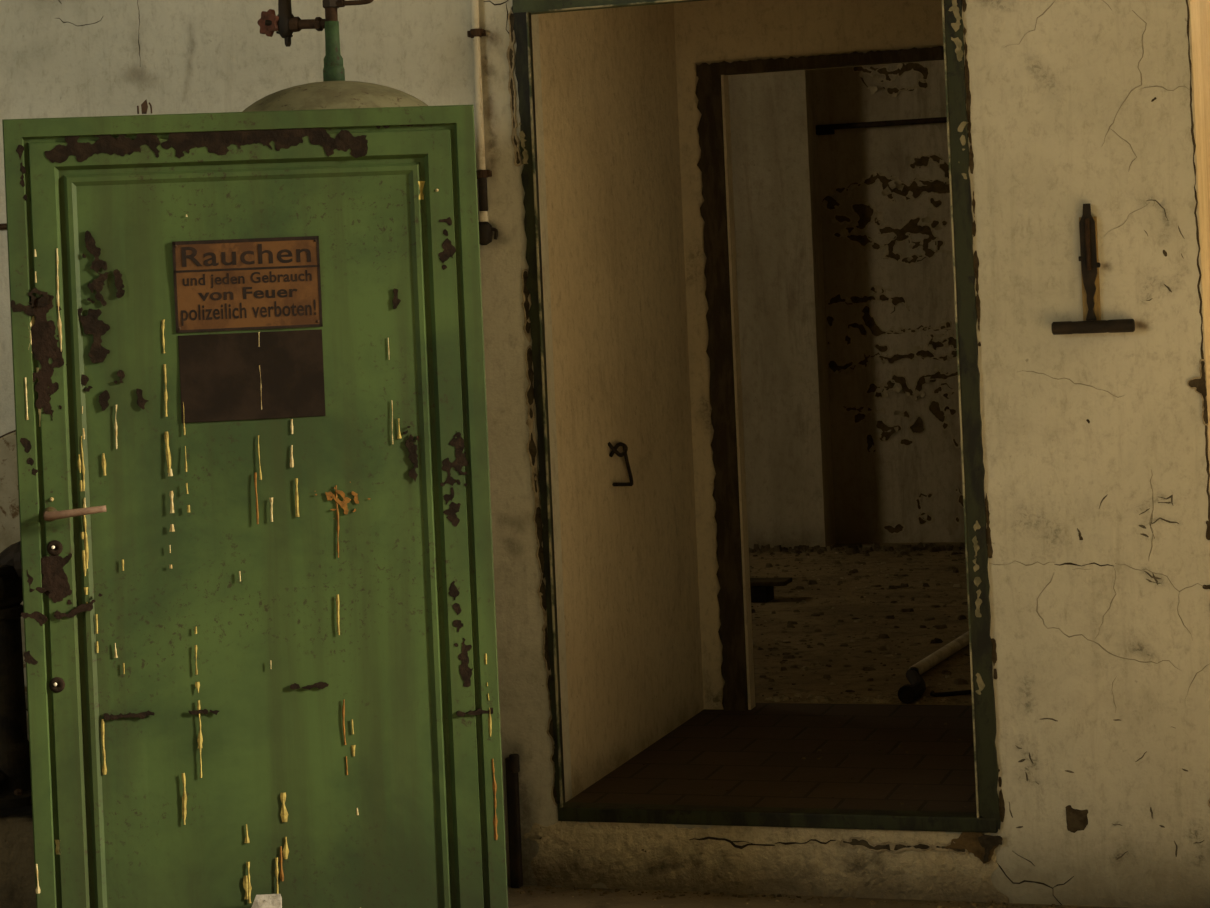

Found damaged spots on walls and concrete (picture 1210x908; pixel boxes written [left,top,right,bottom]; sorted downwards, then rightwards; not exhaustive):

crack [484,0,509,33]
crack [1101,0,1188,172]
peeling [821,0,981,346]
peeling [825,284,961,453]
crack [1019,370,1122,398]
spalling [955,488,993,617]
crack [990,470,1209,713]
spalling [975,638,997,695]
crack [689,837,836,849]
spalling [1066,805,1088,833]